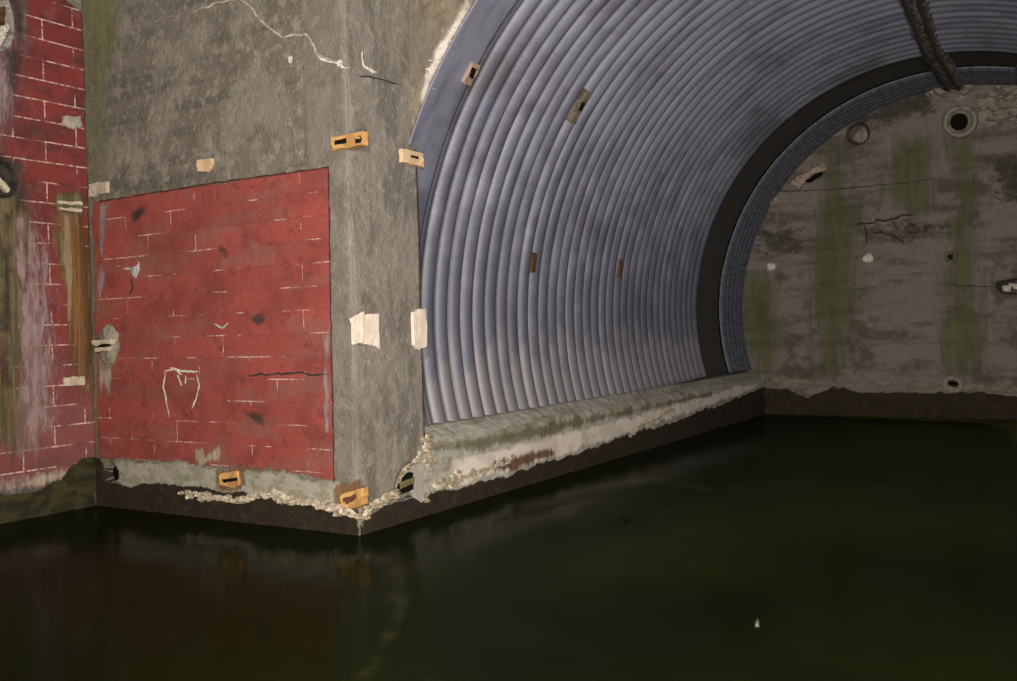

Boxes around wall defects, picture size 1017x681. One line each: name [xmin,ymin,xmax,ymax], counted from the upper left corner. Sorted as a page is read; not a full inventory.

water stain [0,0,26,133]
crack [101,0,398,84]
crack [854,214,916,245]
corrosion [53,209,94,394]
crack [247,370,331,378]
peeling [177,433,437,520]
peeling [432,455,515,491]